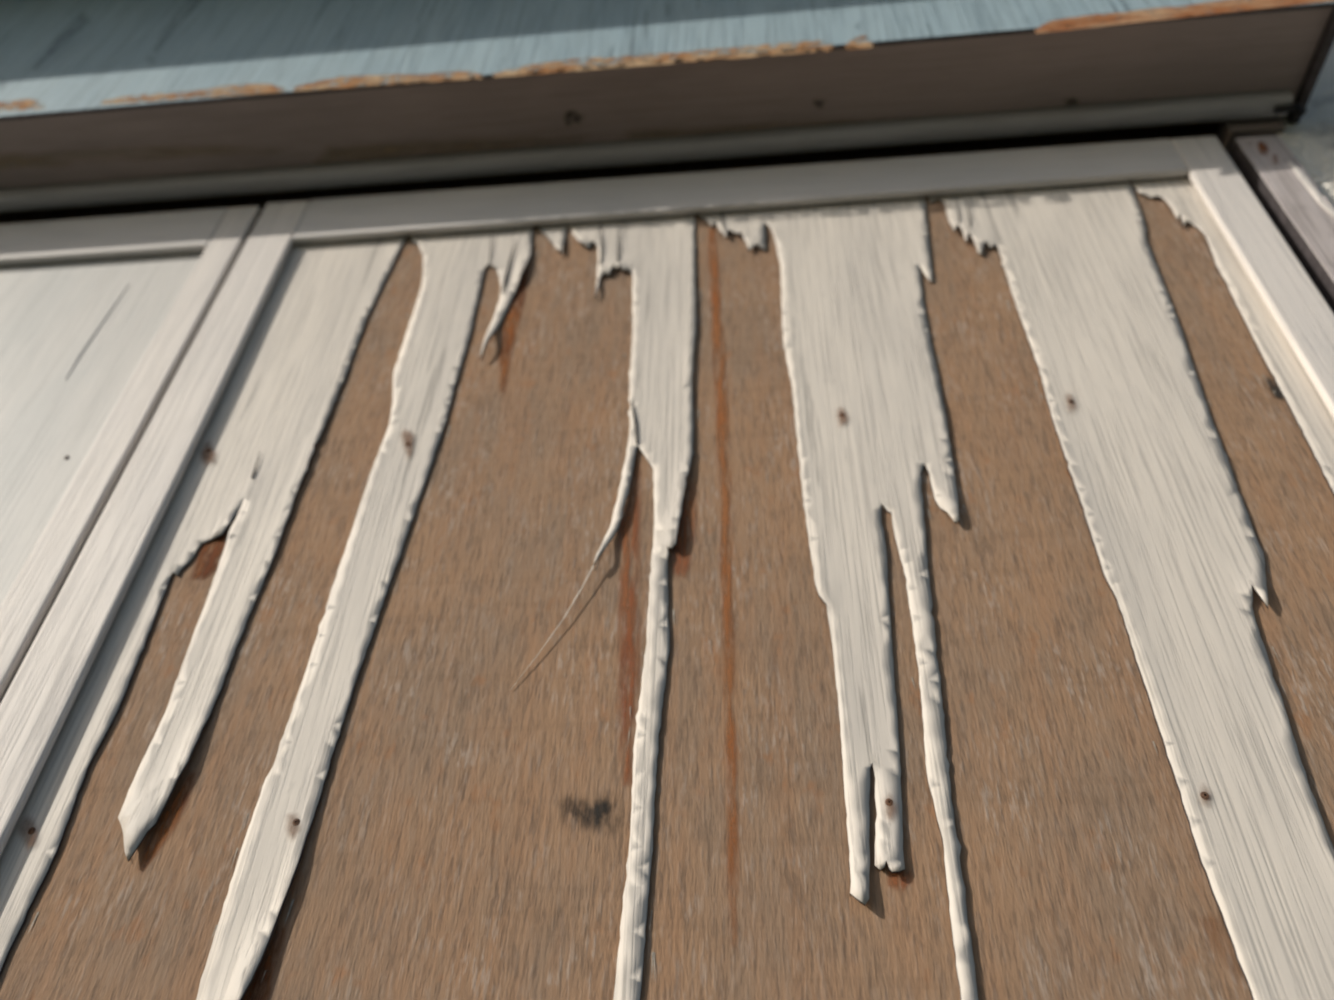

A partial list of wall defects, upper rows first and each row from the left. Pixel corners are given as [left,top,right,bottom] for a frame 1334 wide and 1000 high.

peeling [0,99,45,111]
peeling [0,235,423,1000]
peeling [250,225,654,1000]
rust [709,229,735,780]
peeling [640,196,1252,1000]
peeling [1129,180,1334,847]
peeling [1288,161,1334,218]